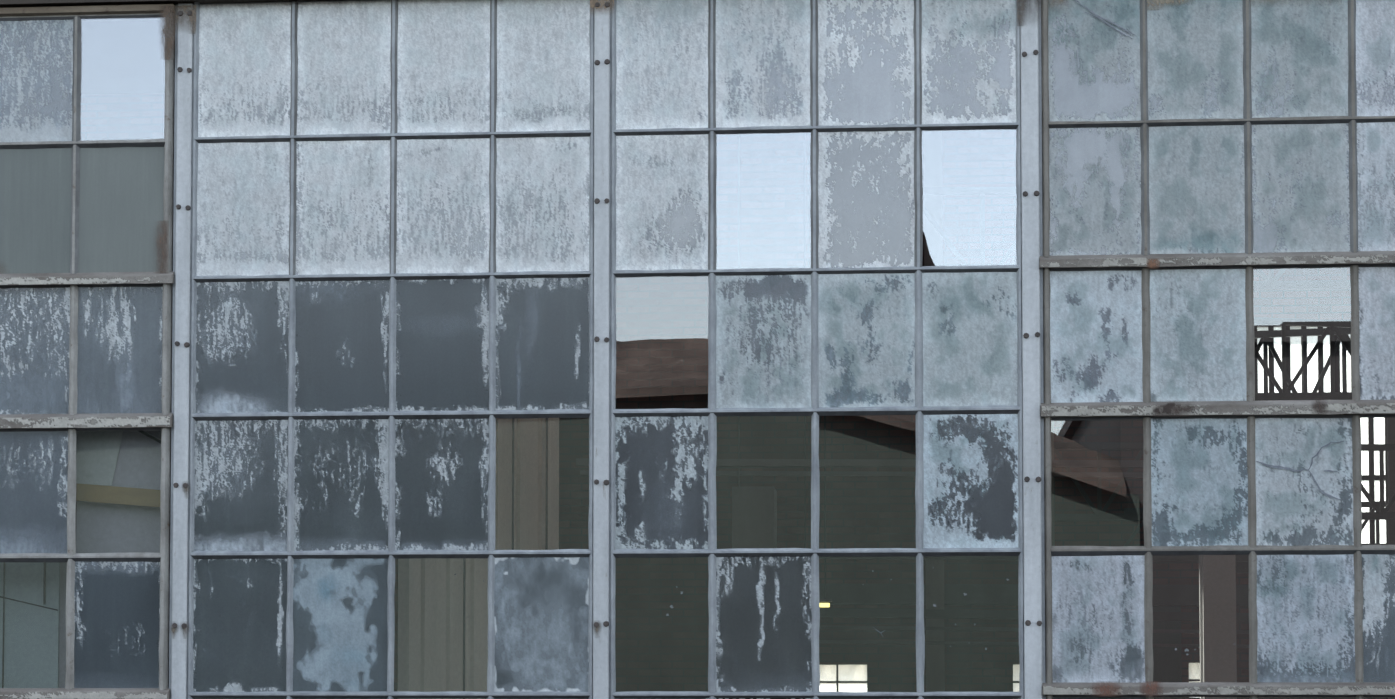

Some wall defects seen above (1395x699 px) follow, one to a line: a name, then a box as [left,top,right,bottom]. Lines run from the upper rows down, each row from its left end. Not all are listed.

rust [161,5,196,60]
peeling [1041,0,1395,695]
peeling [0,277,170,518]
crack [1256,441,1344,500]
rust [1096,683,1118,696]